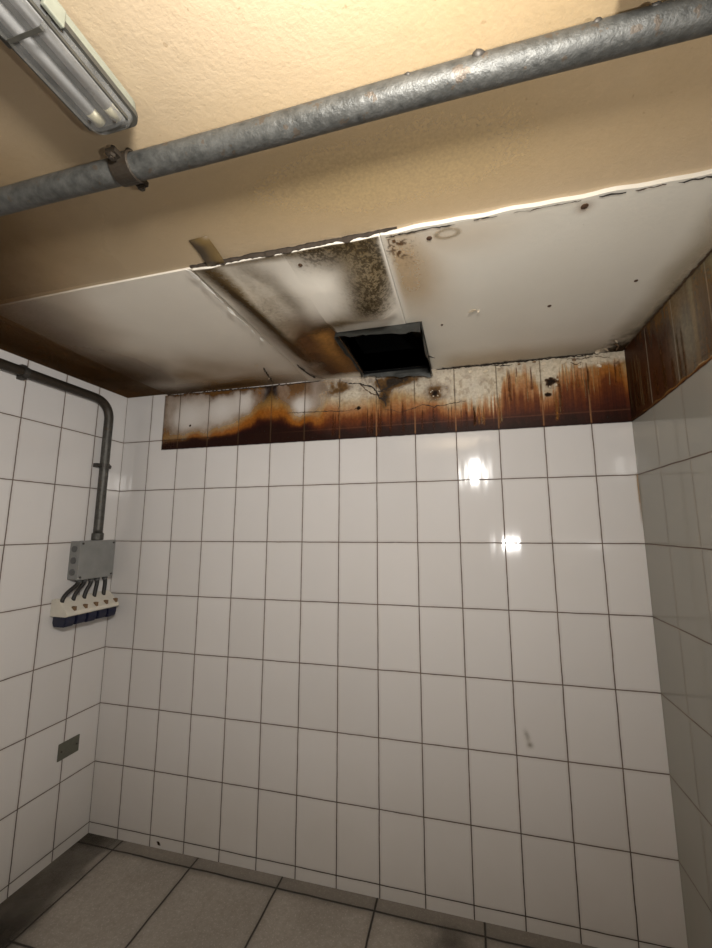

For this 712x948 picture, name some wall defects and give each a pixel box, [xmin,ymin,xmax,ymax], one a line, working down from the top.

crack [386,176,712,238]
damp [297,235,419,315]
rust [161,252,712,450]
crack [436,249,712,370]
damp [542,279,683,359]